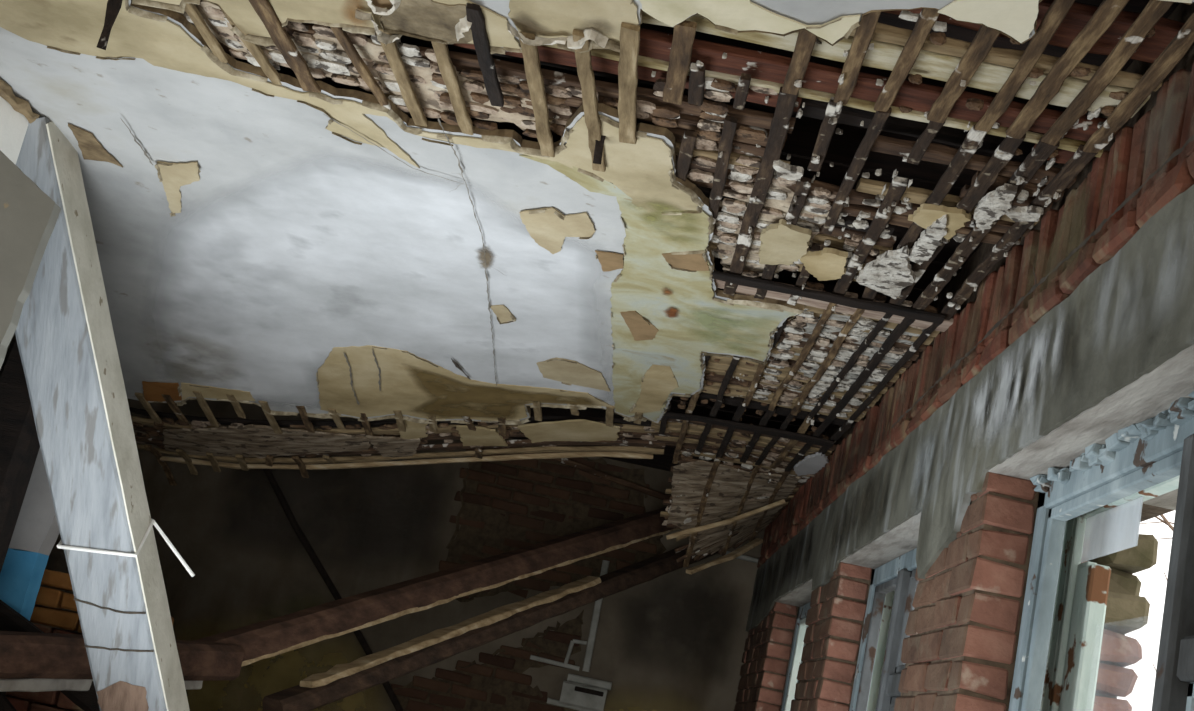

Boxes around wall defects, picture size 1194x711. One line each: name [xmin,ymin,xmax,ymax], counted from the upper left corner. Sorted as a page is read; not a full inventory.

crack [324,114,500,386]
flaking render [129,154,796,571]
flaking render [0,0,1194,476]
water stain [914,444,934,492]
water stain [974,319,1074,435]
peeling [1030,391,1194,493]